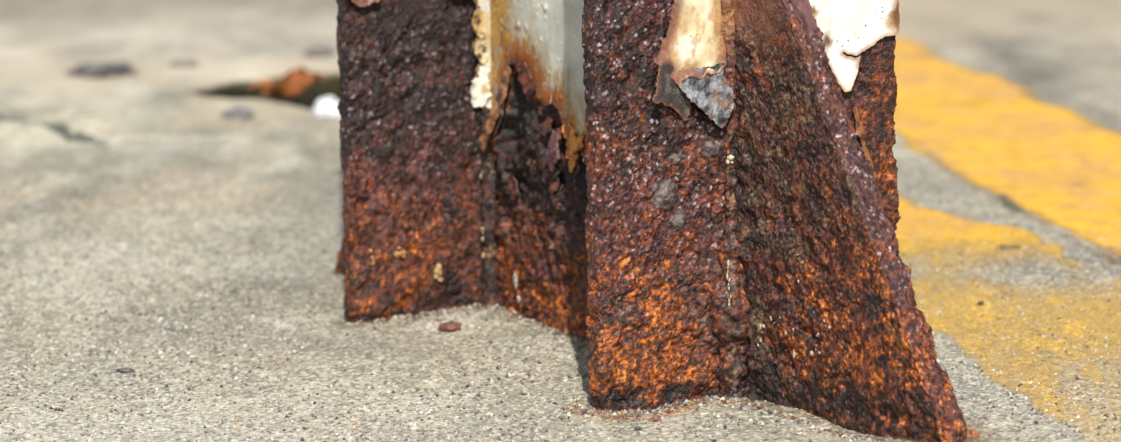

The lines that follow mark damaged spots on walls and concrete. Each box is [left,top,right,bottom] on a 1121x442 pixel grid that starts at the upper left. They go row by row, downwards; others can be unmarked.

peeling [470,0,535,151]
rust [654,0,698,88]
peeling [652,0,735,128]
rust [714,0,735,73]
peeling [790,0,899,92]
rust [886,0,900,32]
peeling [539,117,579,213]